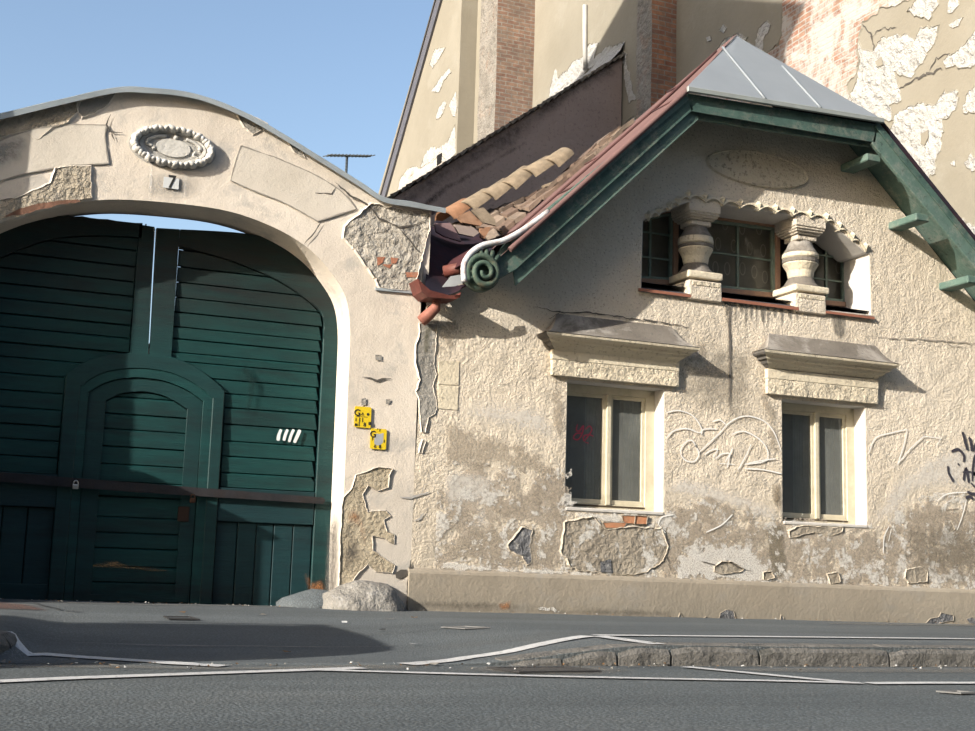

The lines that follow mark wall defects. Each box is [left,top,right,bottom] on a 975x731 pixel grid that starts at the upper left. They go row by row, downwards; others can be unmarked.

peeling [0,93,116,140]
flaking render [706,0,975,179]
spalling [0,165,93,223]
spalling [341,202,431,291]
spalling [338,467,408,586]
spalling [434,461,975,590]